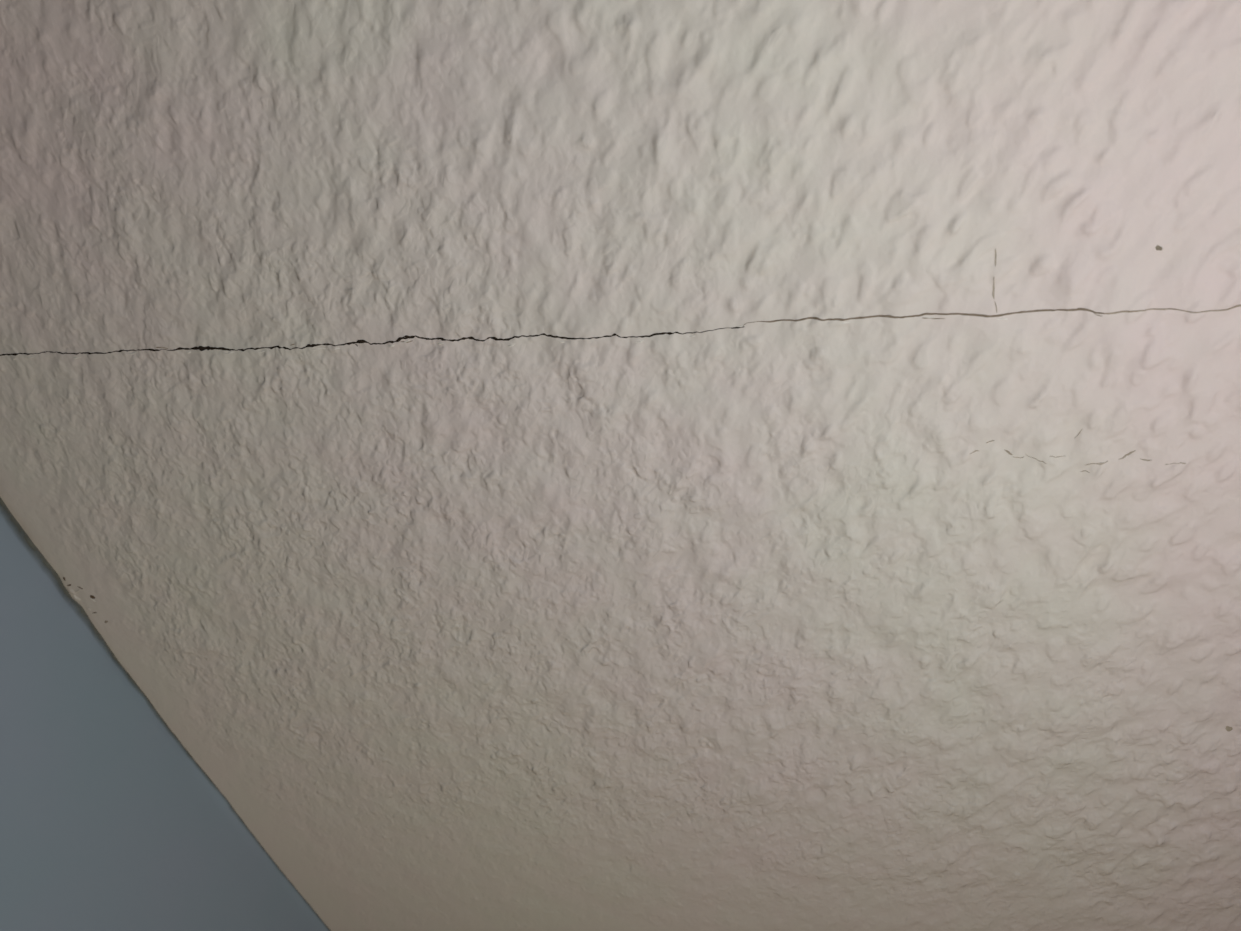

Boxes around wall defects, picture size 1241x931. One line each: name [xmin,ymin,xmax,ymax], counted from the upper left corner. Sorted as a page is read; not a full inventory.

crack [0,248,1241,360]